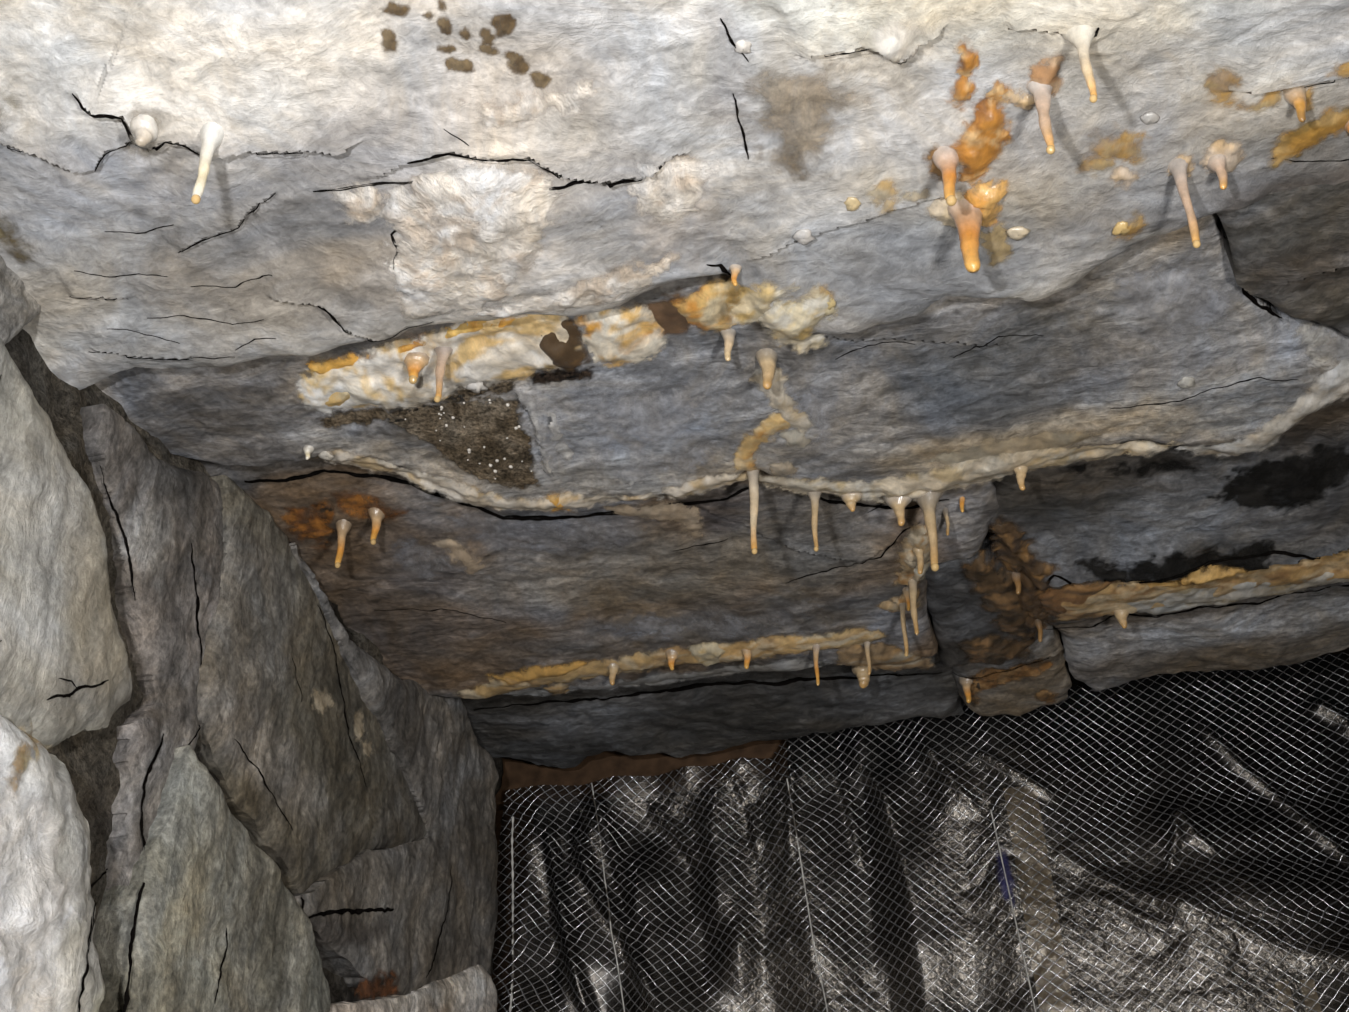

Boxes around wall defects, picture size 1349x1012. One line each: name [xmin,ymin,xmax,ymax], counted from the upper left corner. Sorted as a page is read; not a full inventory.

leakage [381,0,551,88]
crack [72,93,200,172]
crack [313,129,663,192]
leakage [927,44,1063,266]
crack [70,193,276,361]
crack [318,306,432,342]
crack [707,264,731,276]
crack [1242,288,1282,319]
leakage [296,269,1349,578]
leakage [879,525,930,613]
leakage [1038,540,1349,621]
leakage [457,607,933,699]